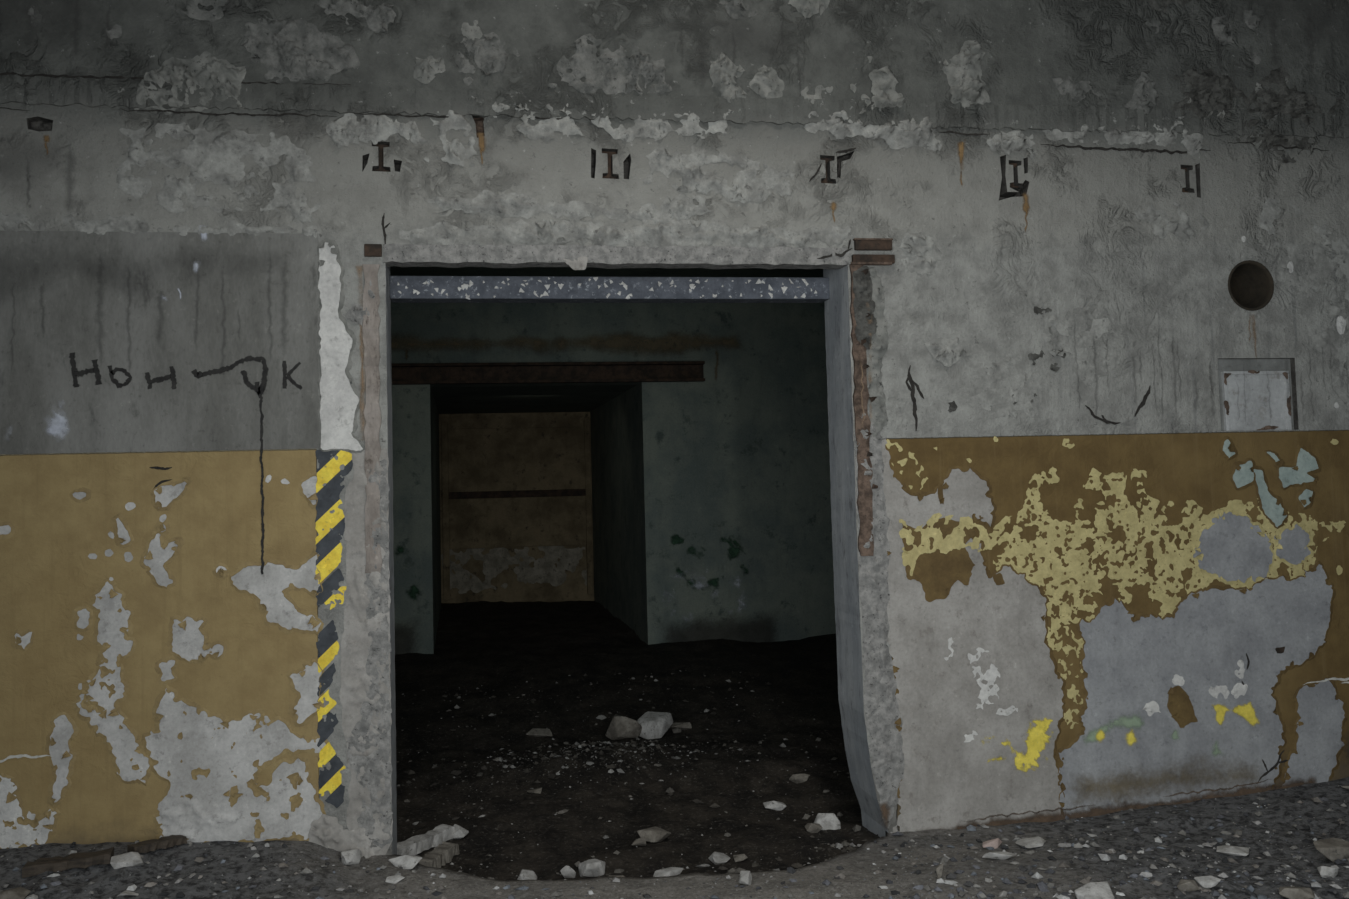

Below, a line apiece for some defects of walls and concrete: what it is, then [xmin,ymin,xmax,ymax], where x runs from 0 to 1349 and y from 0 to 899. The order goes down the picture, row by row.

spalling [473,117,484,138]
crack [906,365,924,431]
crack [1085,386,1151,425]
peeling [0,239,393,858]
peeling [853,266,1348,833]